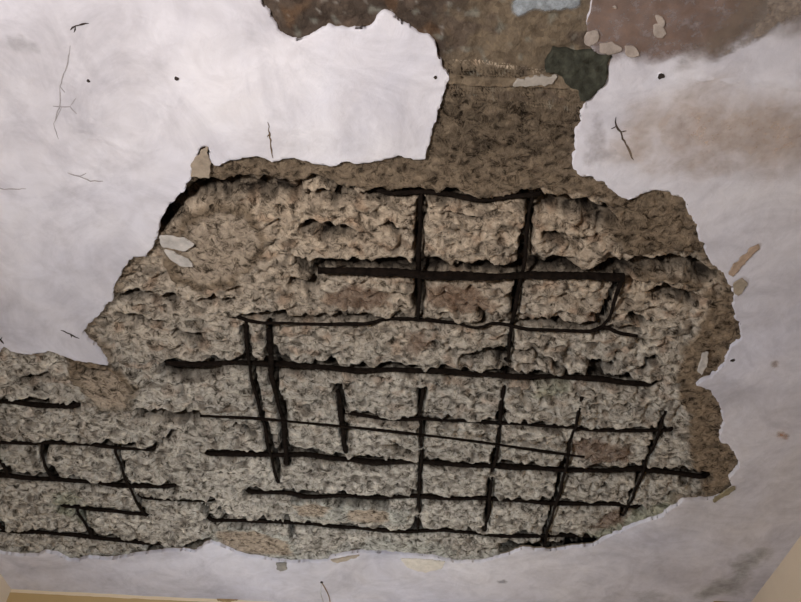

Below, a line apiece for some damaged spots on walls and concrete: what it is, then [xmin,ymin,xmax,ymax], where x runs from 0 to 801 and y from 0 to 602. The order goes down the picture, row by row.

peeling [750,0,801,39]
peeling [262,0,612,114]
crack [53,23,89,137]
crack [611,118,634,160]
peeling [728,244,760,277]
spalling [0,83,747,560]
spalling [331,554,359,563]